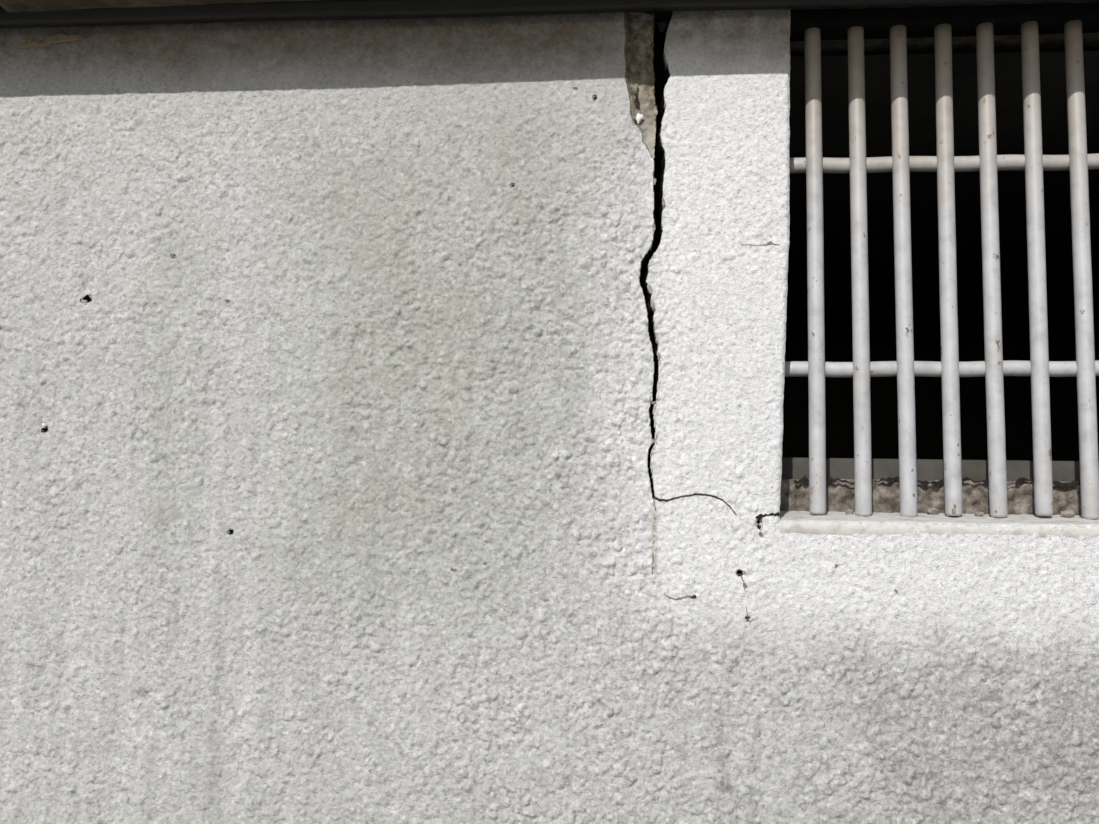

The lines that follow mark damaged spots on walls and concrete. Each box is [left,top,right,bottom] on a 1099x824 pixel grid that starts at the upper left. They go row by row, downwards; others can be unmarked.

spalling [624,12,656,158]
crack [639,11,737,600]